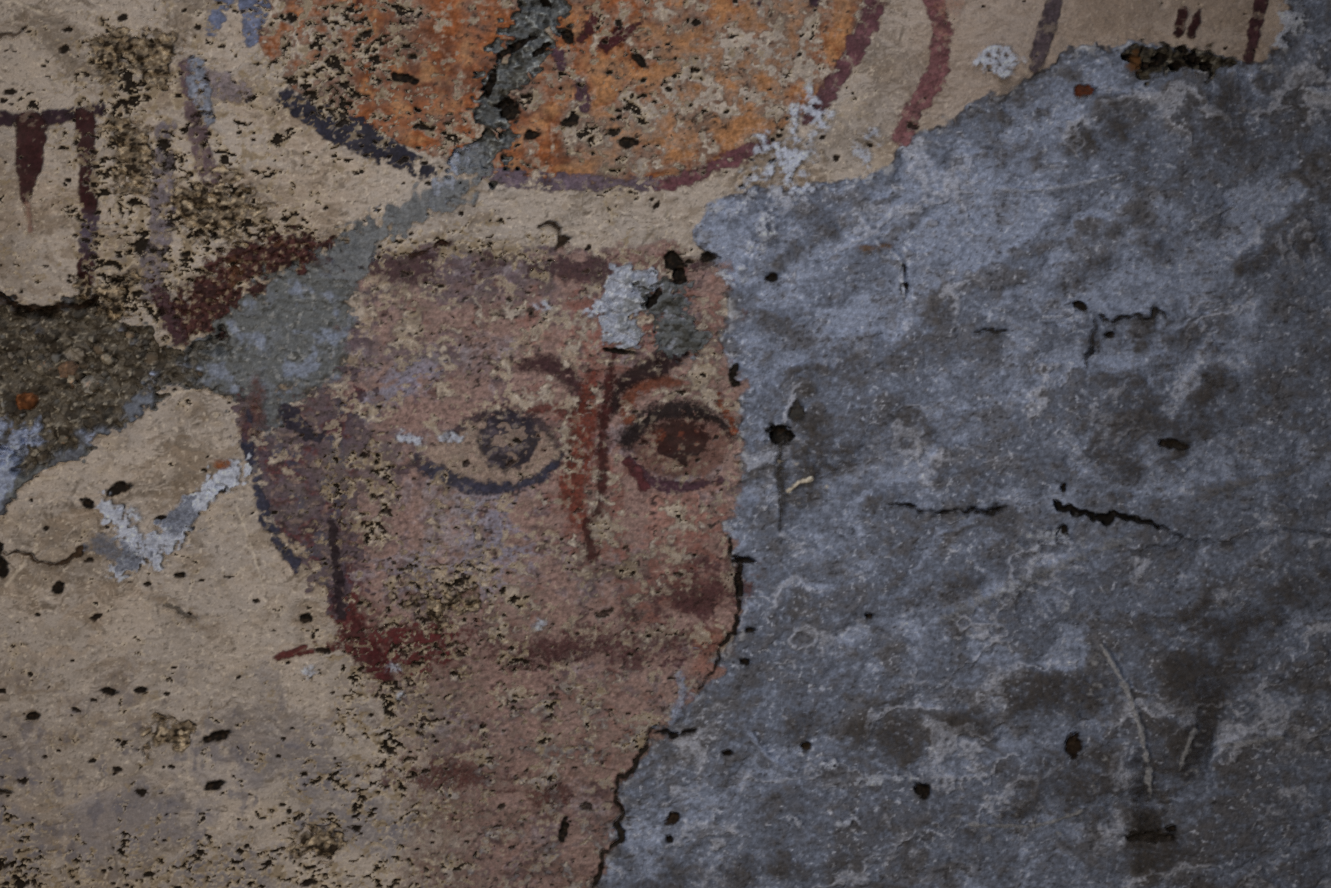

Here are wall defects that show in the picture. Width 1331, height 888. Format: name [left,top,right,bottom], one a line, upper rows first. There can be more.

spalling [631,54,648,68]
spalling [1121,39,1237,86]
spalling [560,114,579,127]
spalling [619,137,639,148]
spalling [0,0,574,515]
peeling [592,251,721,361]
spalling [788,399,805,421]
crack [889,503,1008,516]
crack [1044,483,1183,545]
spalling [406,583,481,634]
spalling [140,713,196,760]